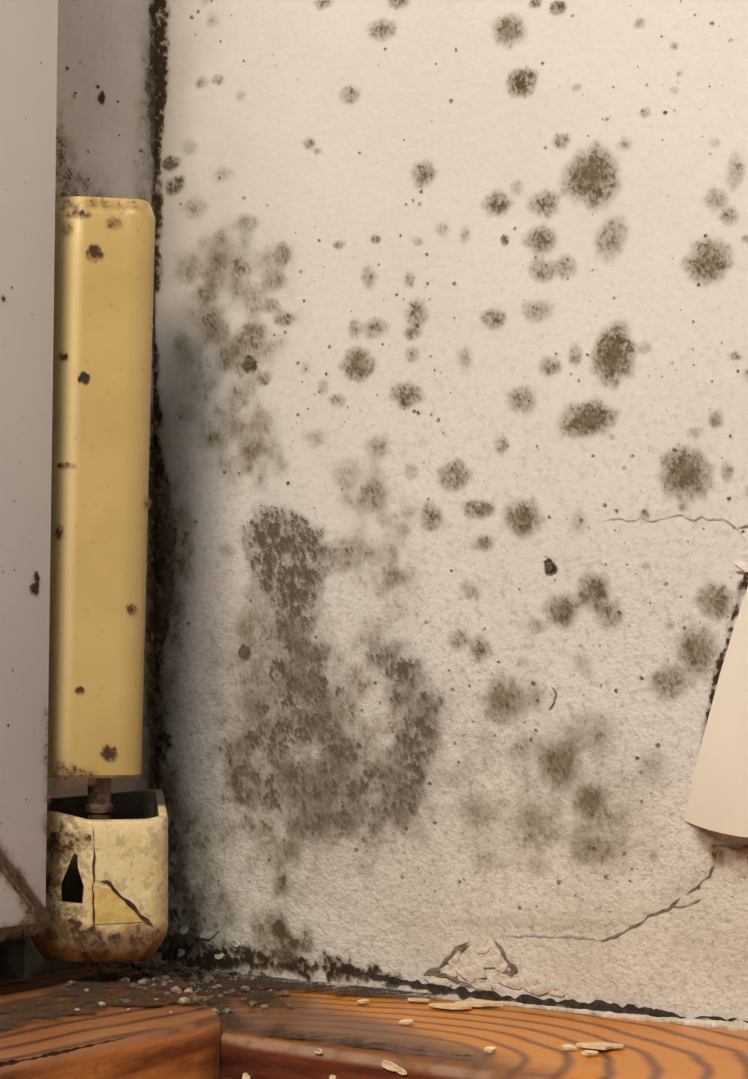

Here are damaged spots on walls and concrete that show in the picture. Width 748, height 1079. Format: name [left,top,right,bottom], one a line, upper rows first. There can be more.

mould [508,62,543,94]
water stain [530,135,616,216]
mould [687,234,729,286]
mould [542,323,634,384]
water stain [563,401,616,436]
water stain [139,0,401,988]
crack [604,514,748,540]
water stain [543,556,557,581]
peeling [734,554,748,573]
mould [546,574,629,627]
water stain [640,573,748,724]
mould [215,505,455,893]